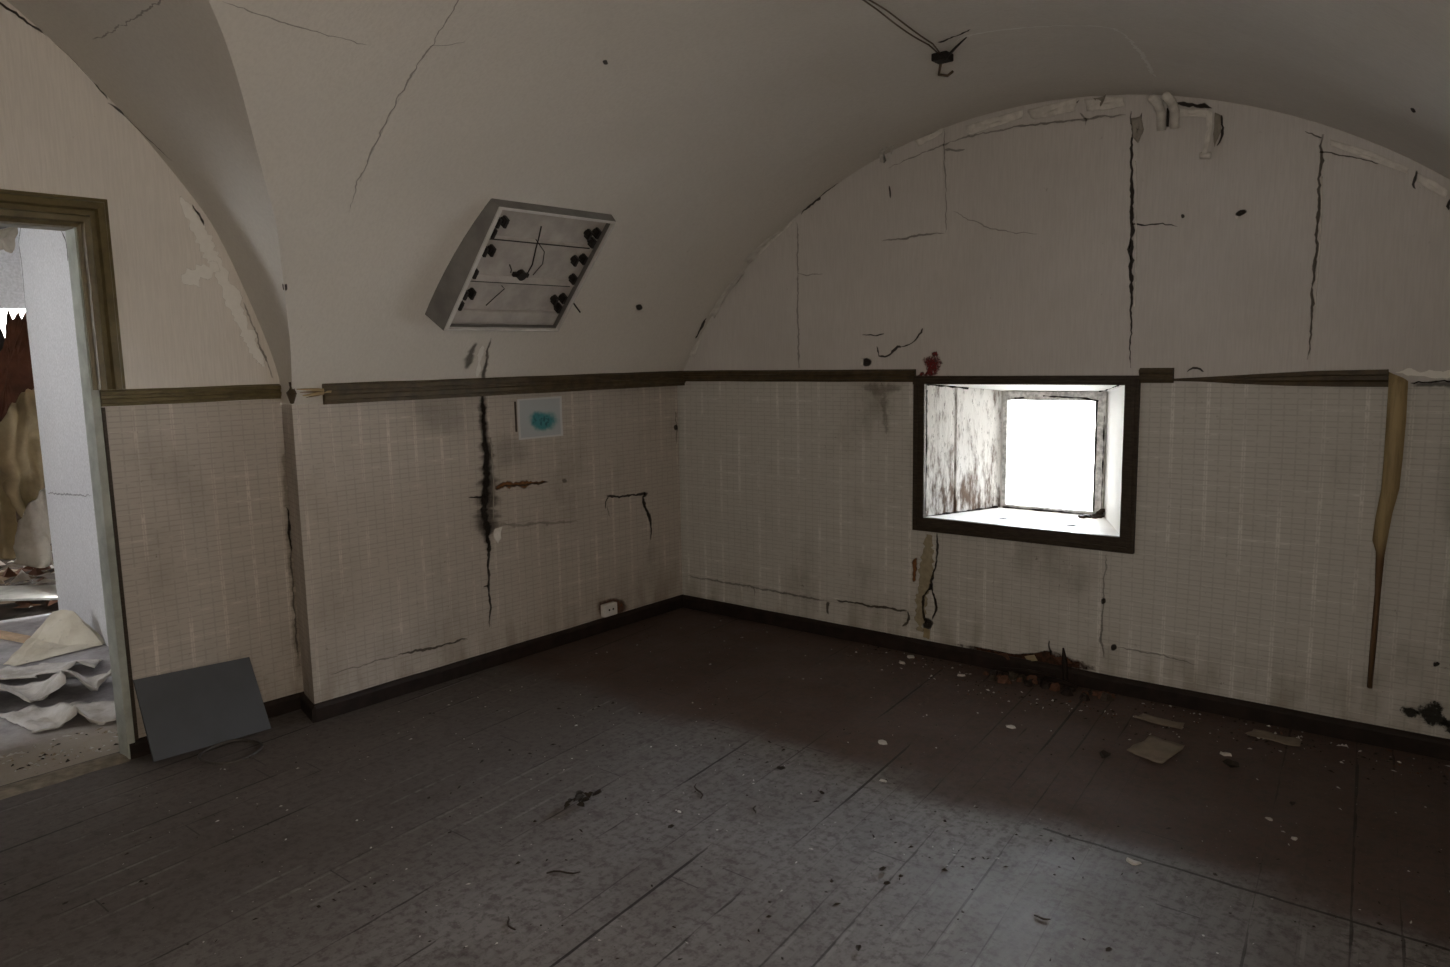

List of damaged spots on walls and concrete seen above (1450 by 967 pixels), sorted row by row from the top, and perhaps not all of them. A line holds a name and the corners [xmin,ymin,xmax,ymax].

peeling [1179,108,1224,159]
crack [1305,131,1378,355]
crack [826,113,1174,629]
crack [399,396,502,655]
corrosion [495,480,546,490]
crack [605,492,652,540]